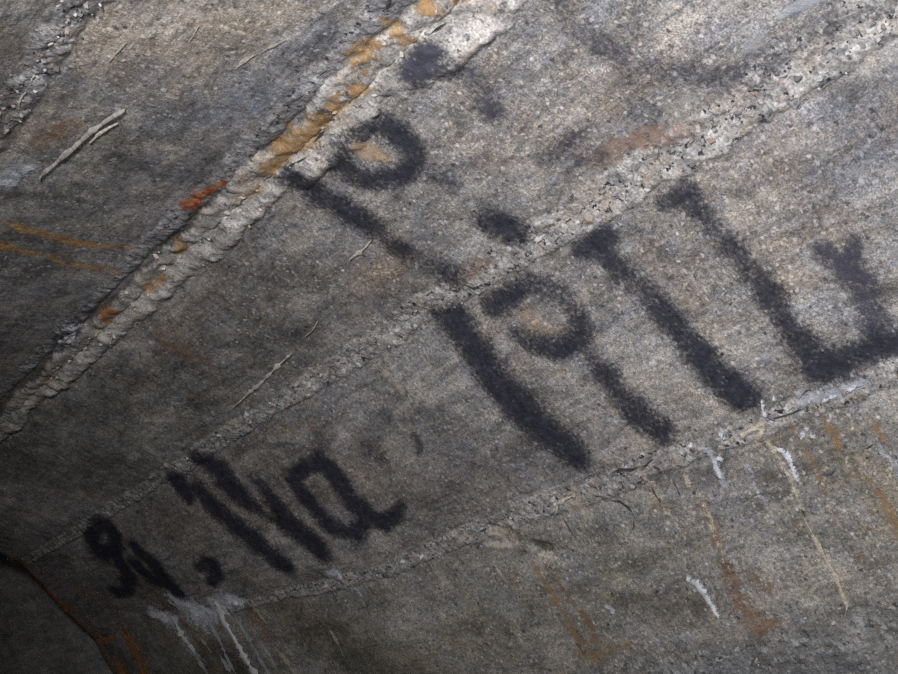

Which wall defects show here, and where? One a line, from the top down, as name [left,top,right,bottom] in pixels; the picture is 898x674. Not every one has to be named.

rust [414,0,470,21]
rust [257,17,417,177]
rust [180,180,227,211]
rust [700,500,782,637]
water stain [147,588,296,674]